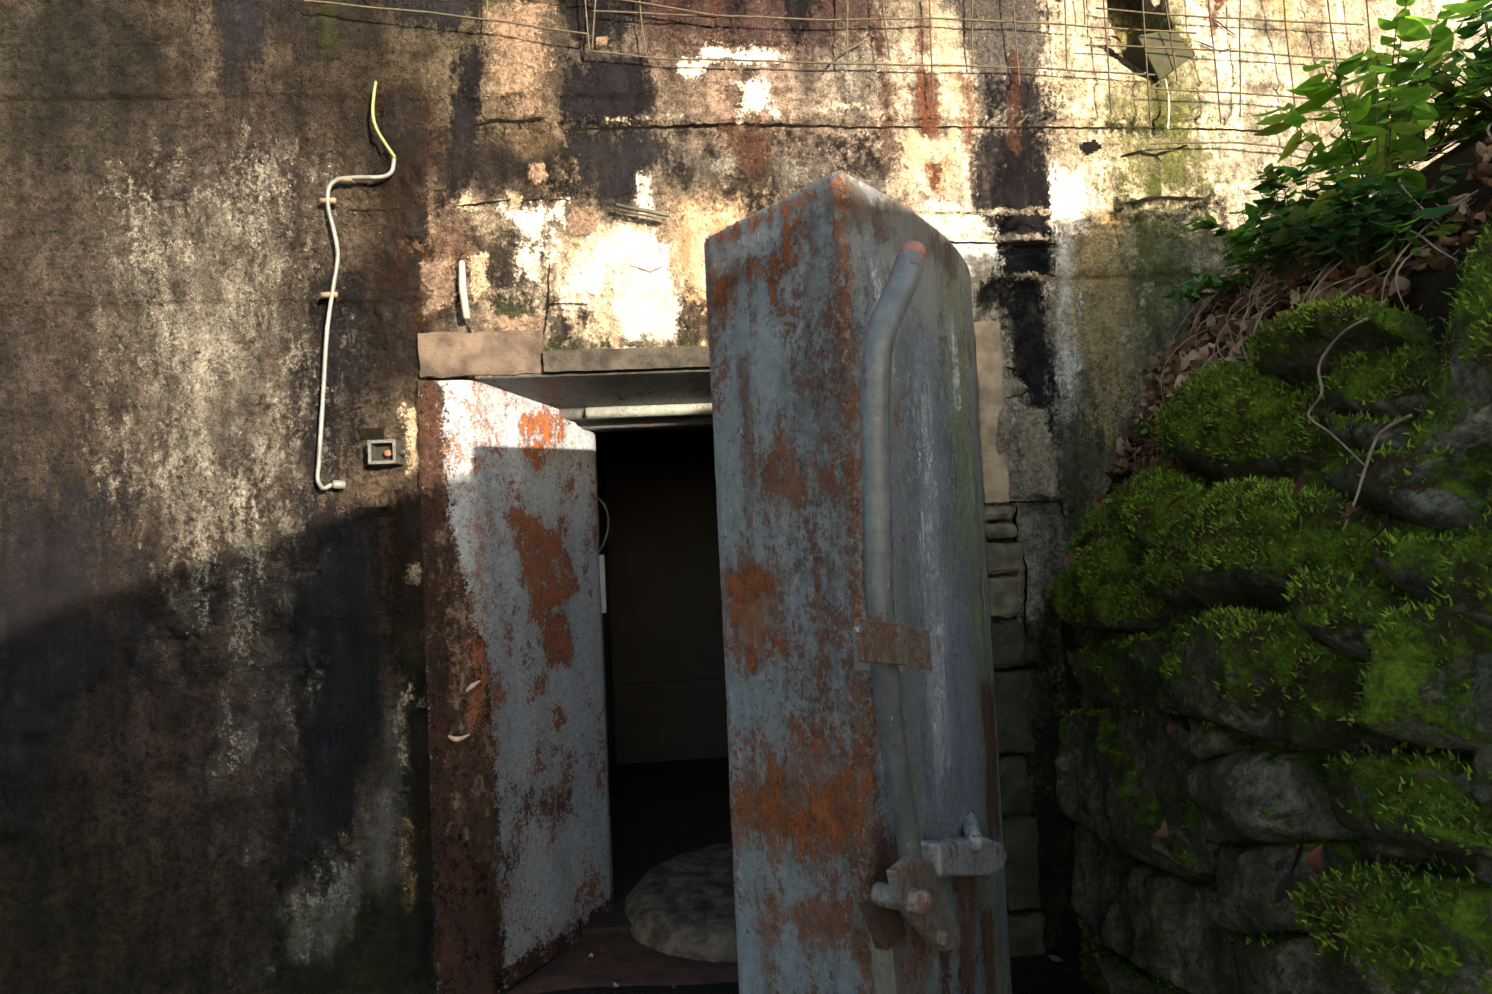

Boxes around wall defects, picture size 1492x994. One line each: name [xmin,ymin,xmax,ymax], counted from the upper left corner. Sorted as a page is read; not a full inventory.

damp [375,0,1149,478]
rust [929,229,953,280]
damp [0,0,437,994]
rust [366,78,614,994]
rust [704,170,899,994]
rust [938,876,996,994]
rust [978,677,1001,842]